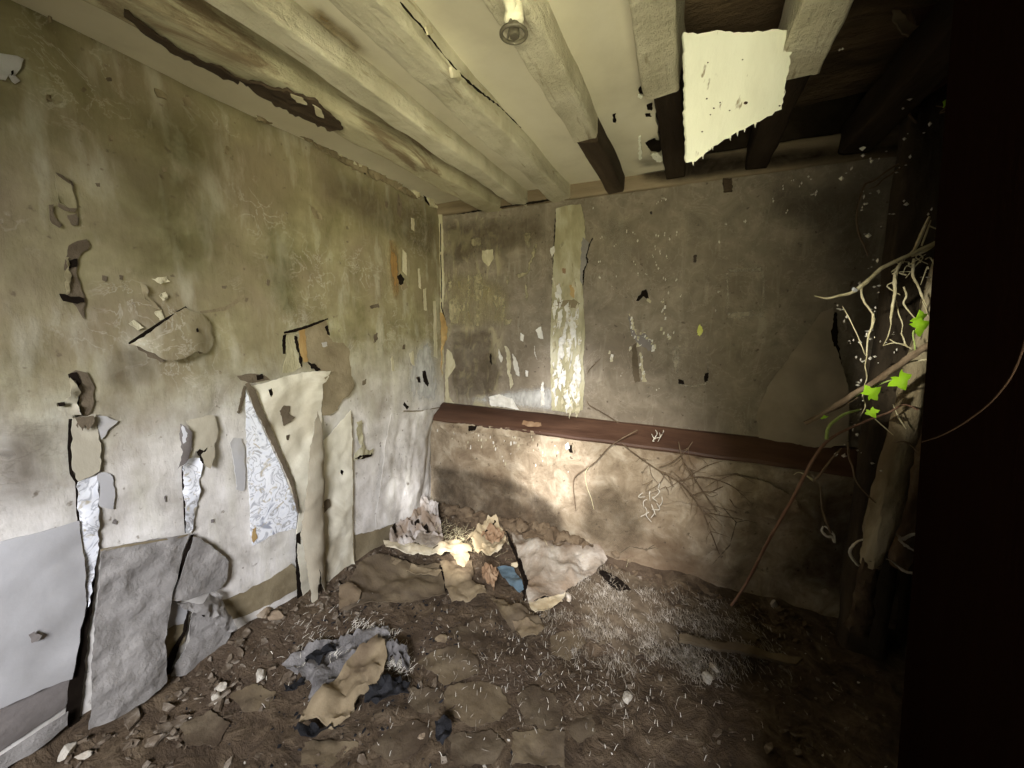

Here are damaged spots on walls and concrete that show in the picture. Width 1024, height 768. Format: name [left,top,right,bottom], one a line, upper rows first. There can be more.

peeling [239,78,343,132]
flaking render [300,136,438,208]
peeling [140,276,170,320]
peeling [520,277,582,419]
flaking render [237,373,270,383]
water stain [504,391,552,408]